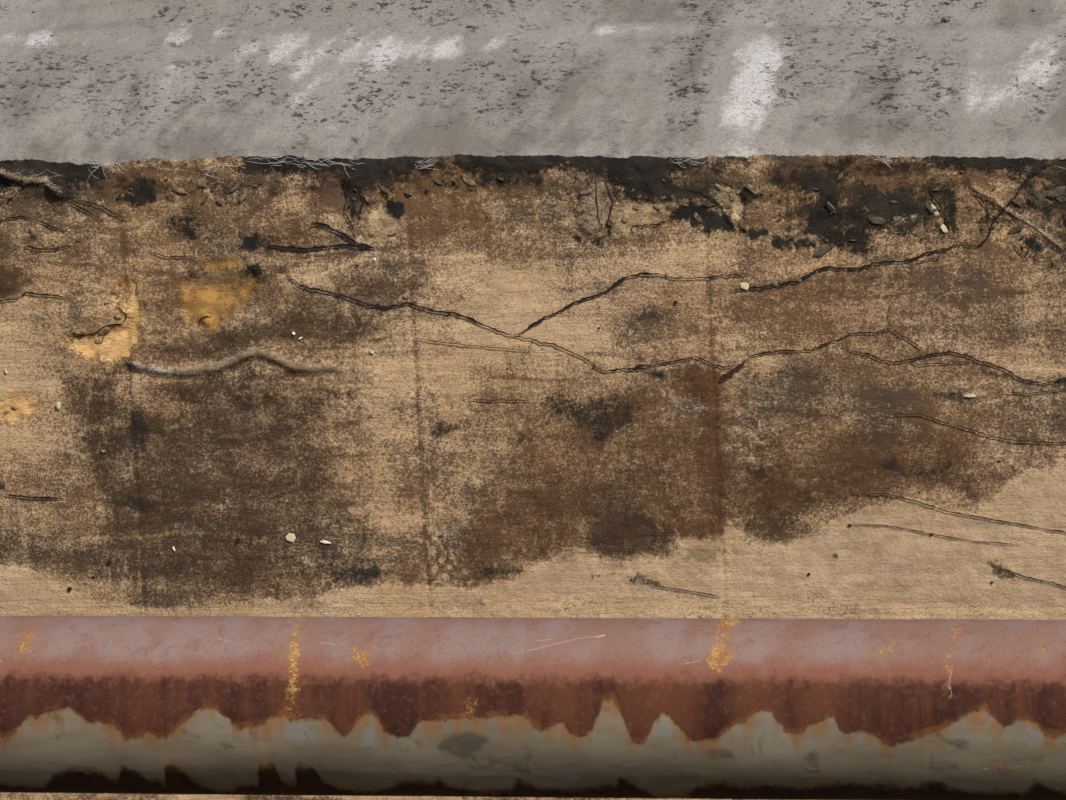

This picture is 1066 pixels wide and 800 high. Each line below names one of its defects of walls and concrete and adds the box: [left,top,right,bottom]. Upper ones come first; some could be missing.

crack [0,292,74,301]
crack [0,195,126,250]
leakage [184,232,285,290]
leakage [0,154,1066,269]
crack [289,165,1066,394]
leakage [35,303,388,603]
leakage [438,365,988,587]
crack [893,413,1066,444]
crack [846,493,1066,588]
leakage [988,563,1020,580]
corrosion [0,615,1066,746]
corrosion [0,763,1066,800]